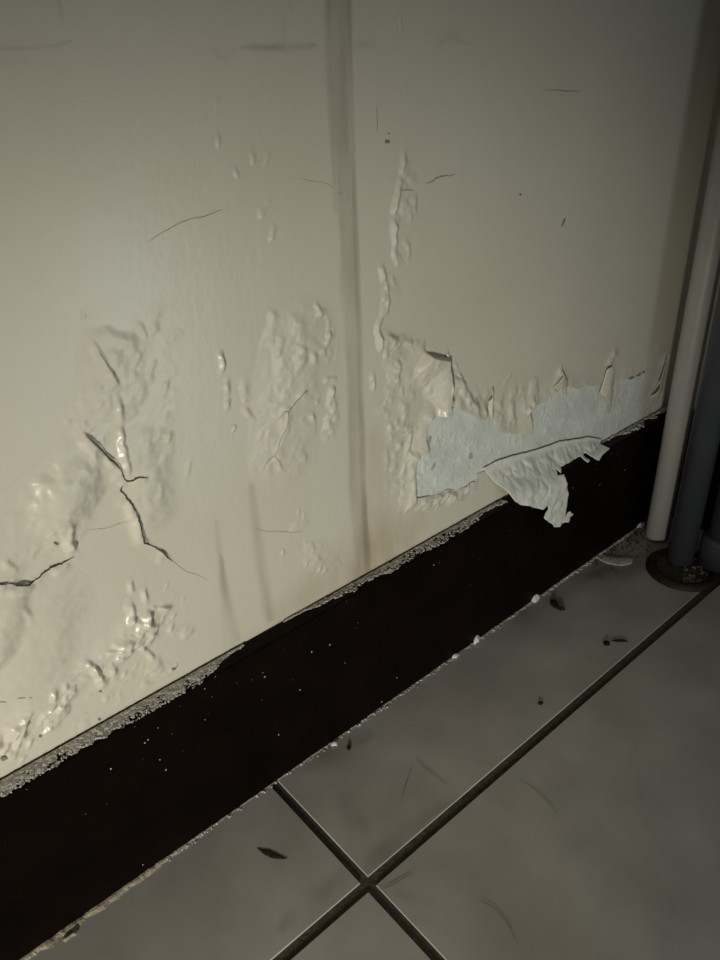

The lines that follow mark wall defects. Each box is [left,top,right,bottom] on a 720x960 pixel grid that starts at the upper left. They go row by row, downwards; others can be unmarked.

crack [147,210,220,243]
crack [262,391,307,472]
peeling [367,328,676,527]
crack [0,557,73,587]
crack [84,432,201,577]
peeling [0,576,201,769]